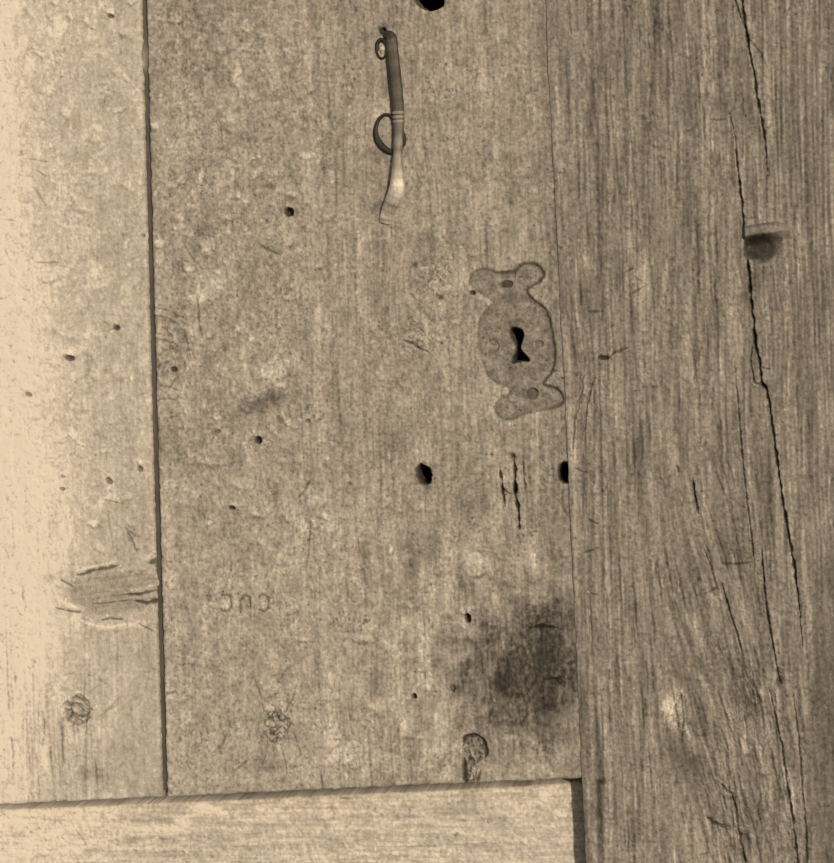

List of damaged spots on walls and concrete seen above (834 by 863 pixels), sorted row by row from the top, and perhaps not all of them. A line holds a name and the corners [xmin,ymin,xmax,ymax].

crack [725,0,812,863]
crack [700,545,746,658]
crack [701,779,750,863]